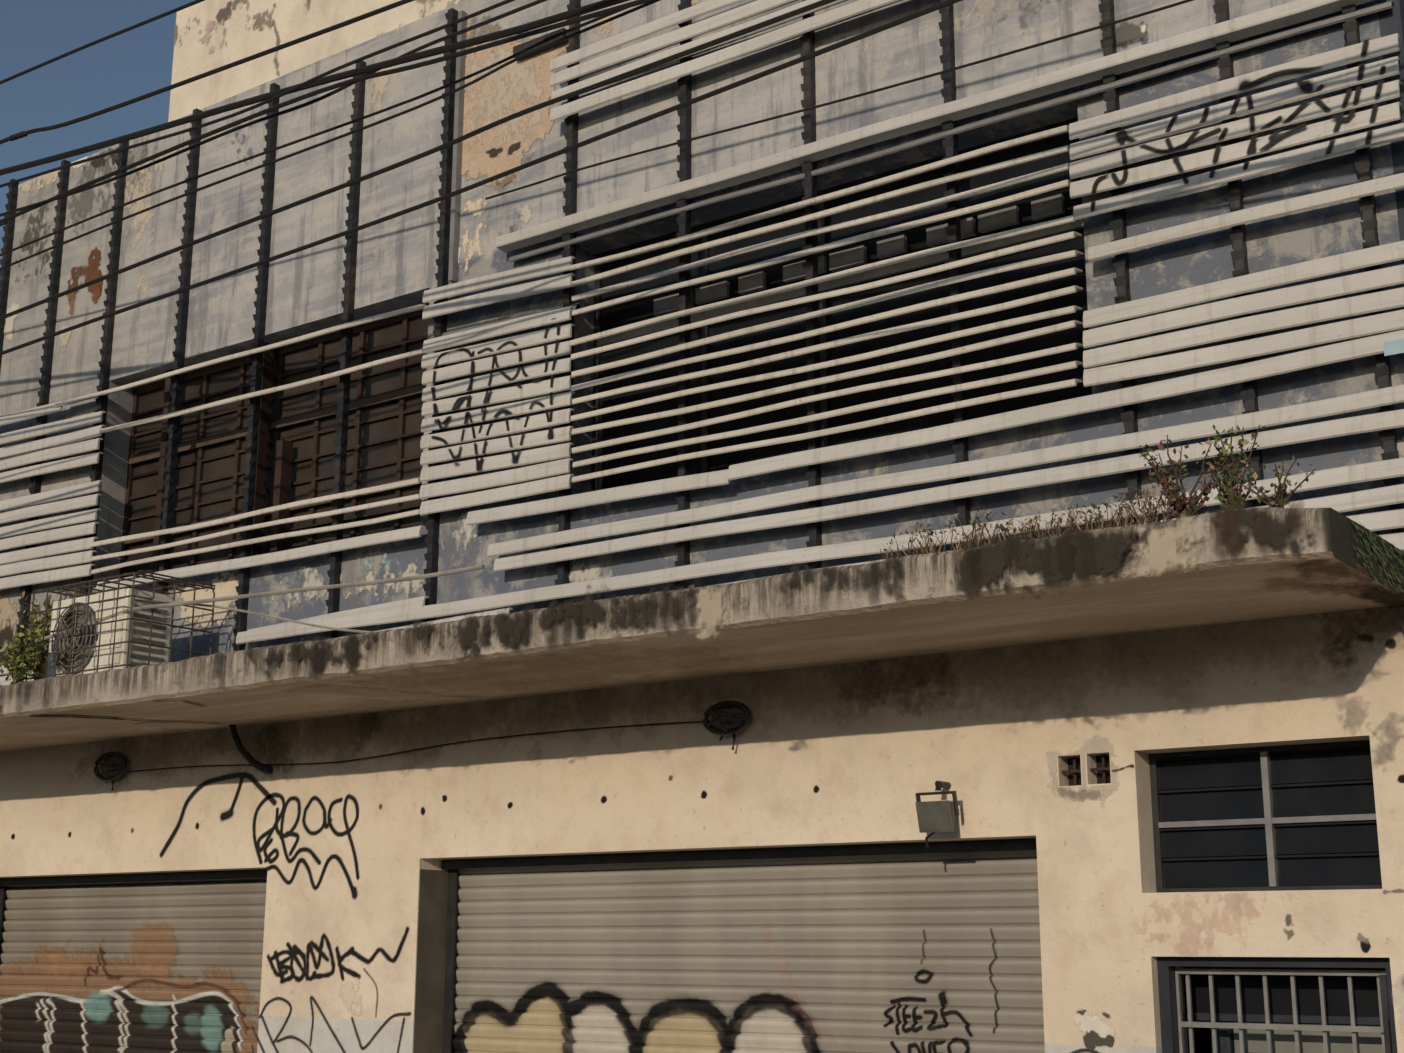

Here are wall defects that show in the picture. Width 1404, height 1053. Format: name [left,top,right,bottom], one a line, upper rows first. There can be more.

flaking render [174,0,279,75]
peeling [18,156,88,192]
peeling [125,152,164,247]
spalling [458,16,581,275]
rust [67,247,103,315]
peeling [4,302,20,341]
leakage [1212,504,1314,555]
leakage [781,558,901,595]
leakage [955,530,1141,596]
leakage [413,586,695,662]
leakage [246,633,410,698]
peeling [1073,1008,1115,1049]